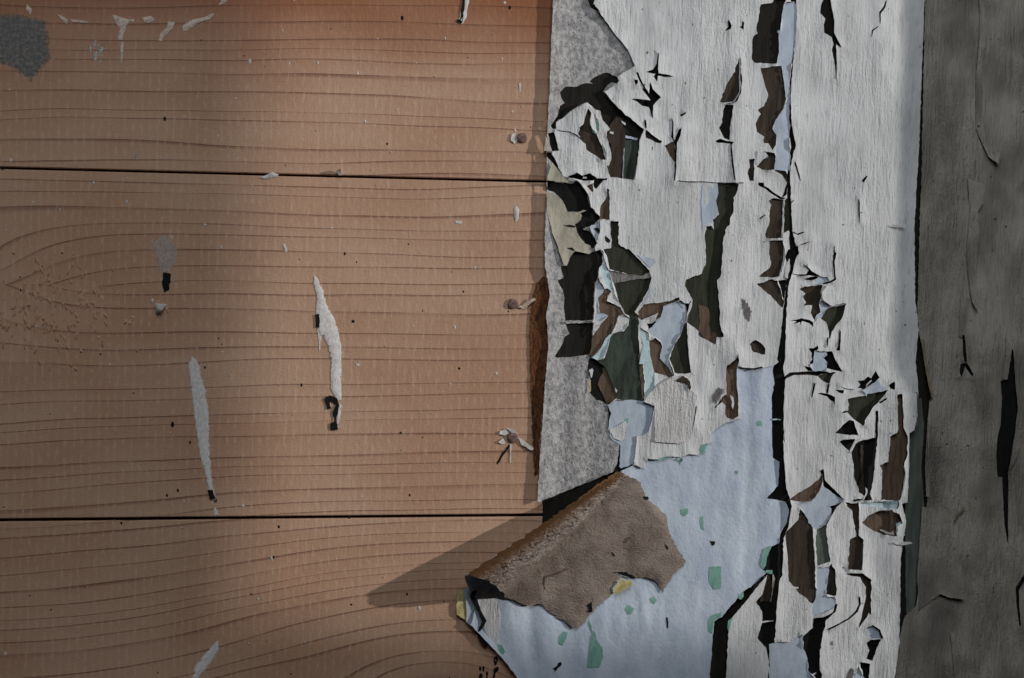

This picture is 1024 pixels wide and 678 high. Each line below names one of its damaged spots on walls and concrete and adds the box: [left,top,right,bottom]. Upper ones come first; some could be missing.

peeling [544,0,797,470]
peeling [800,252,845,338]
peeling [769,339,965,678]
peeling [709,566,721,590]
peeling [587,619,603,668]
peeling [708,613,733,634]